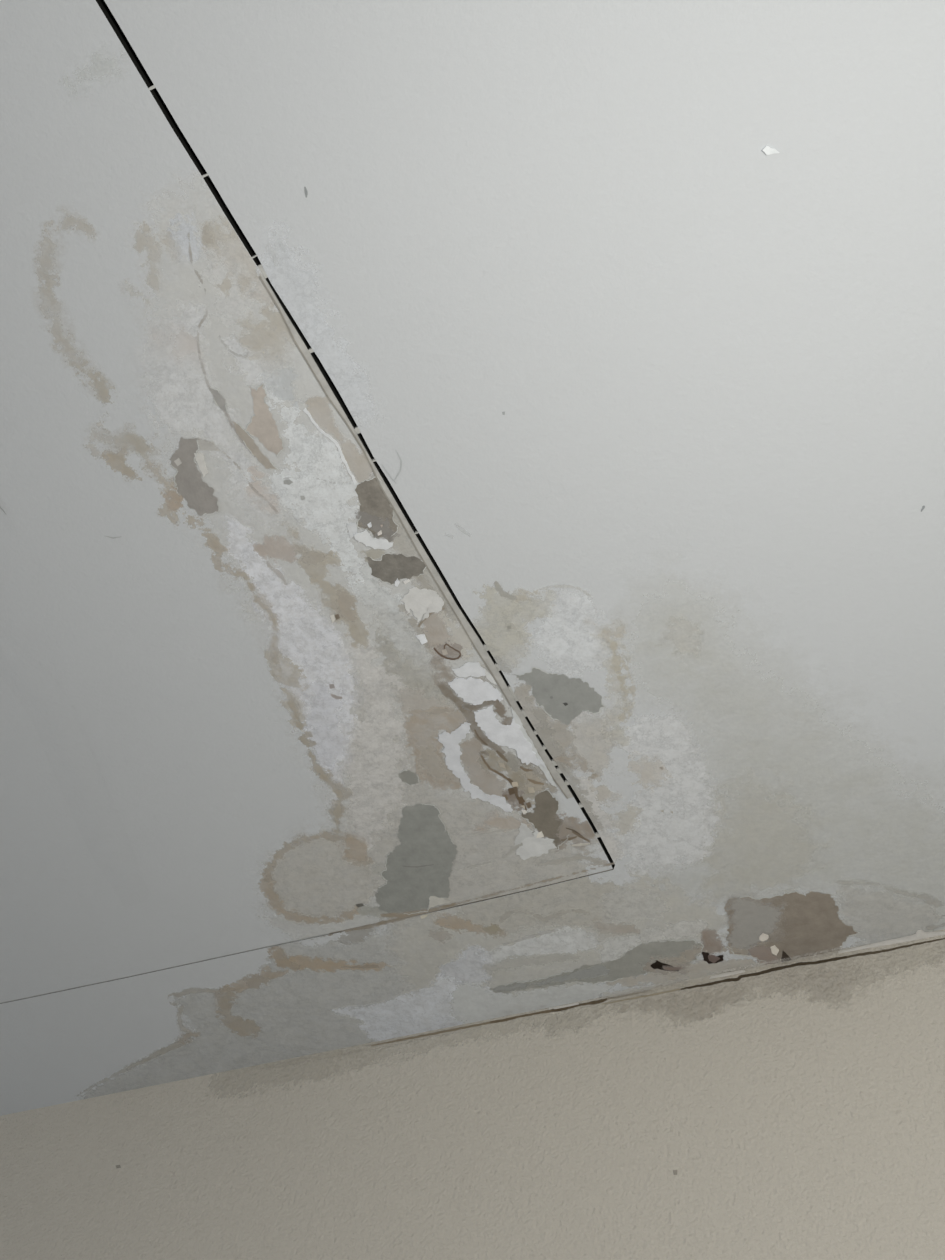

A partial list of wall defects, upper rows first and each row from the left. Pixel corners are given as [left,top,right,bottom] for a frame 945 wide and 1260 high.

spalling [170,437,220,516]
spalling [209,383,293,514]
leakage [80,192,729,1099]
spalling [303,396,606,860]
spalling [356,803,457,919]
spalling [332,886,860,1042]
leakage [544,881,945,1031]